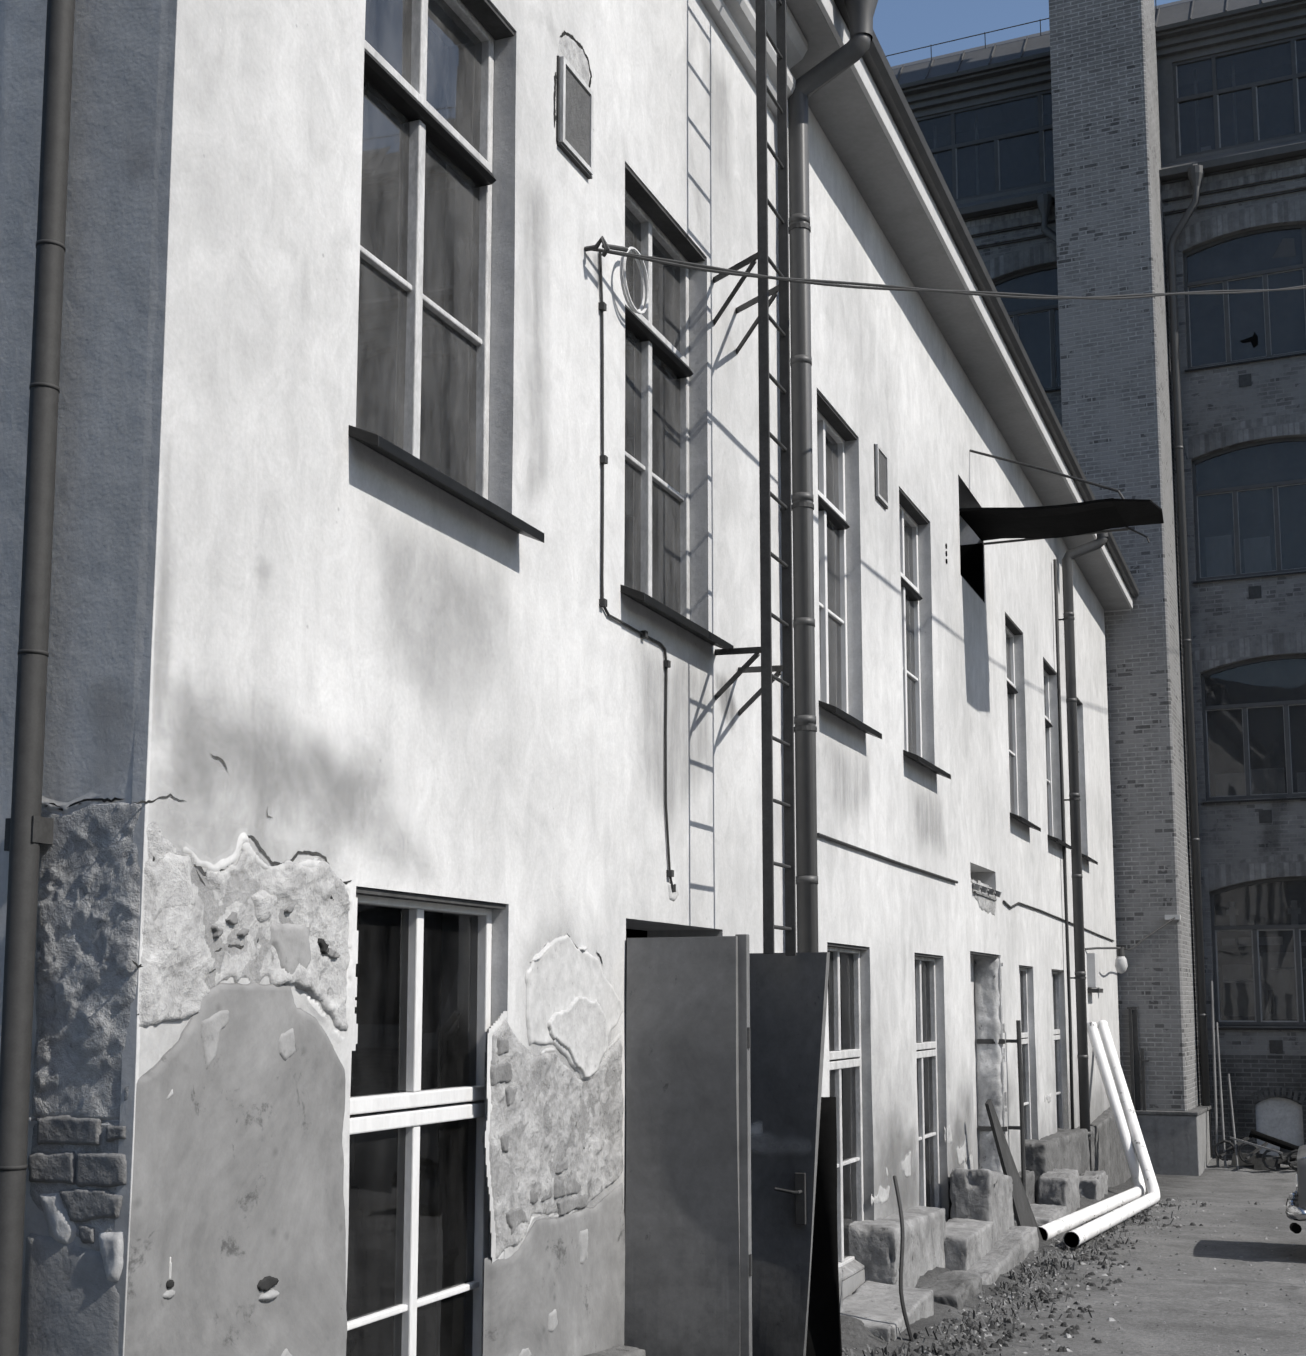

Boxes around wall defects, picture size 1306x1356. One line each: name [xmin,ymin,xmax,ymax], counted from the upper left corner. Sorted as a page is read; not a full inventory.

crack [46,793,185,811]
spalling [28,792,358,1251]
spalling [482,935,624,1263]
spalling [163,1257,175,1300]